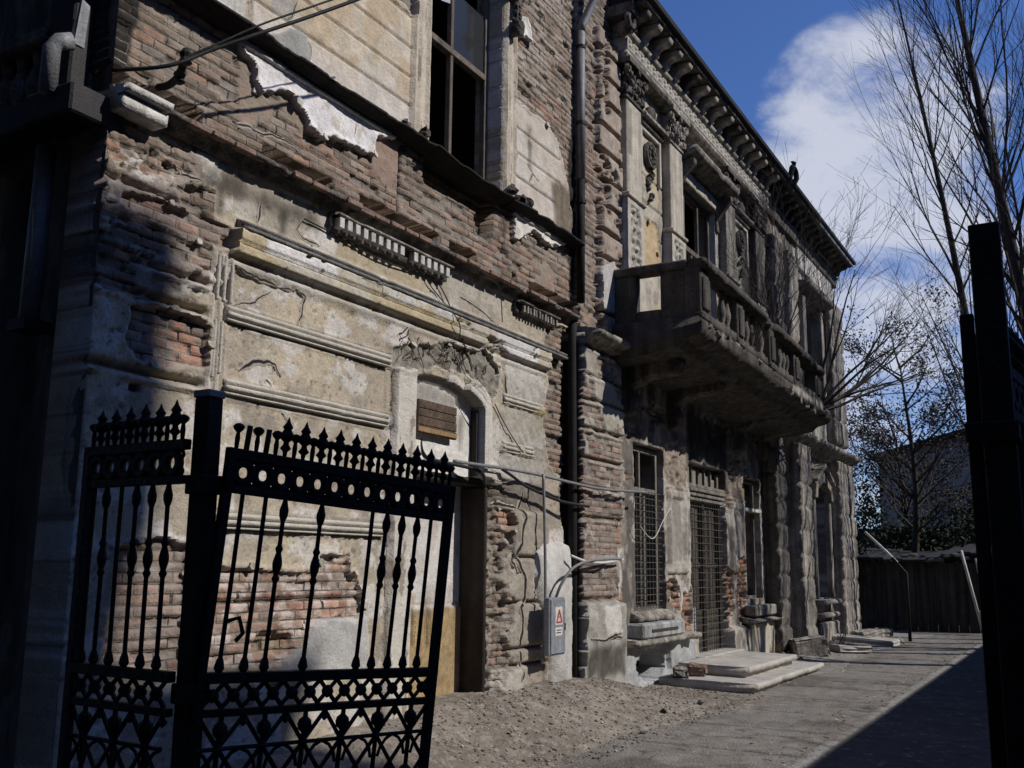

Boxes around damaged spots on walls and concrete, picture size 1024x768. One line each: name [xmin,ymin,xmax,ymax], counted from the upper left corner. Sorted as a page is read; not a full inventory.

flaking render [240,40,392,158]
spalling [121,191,243,248]
crack [234,264,307,326]
spalling [125,304,216,369]
crack [239,357,281,387]
flaking render [392,341,501,398]
spalling [495,507,519,544]
spalling [100,536,186,671]
spalling [208,554,369,664]
spalling [666,578,699,639]
spalling [722,556,747,626]